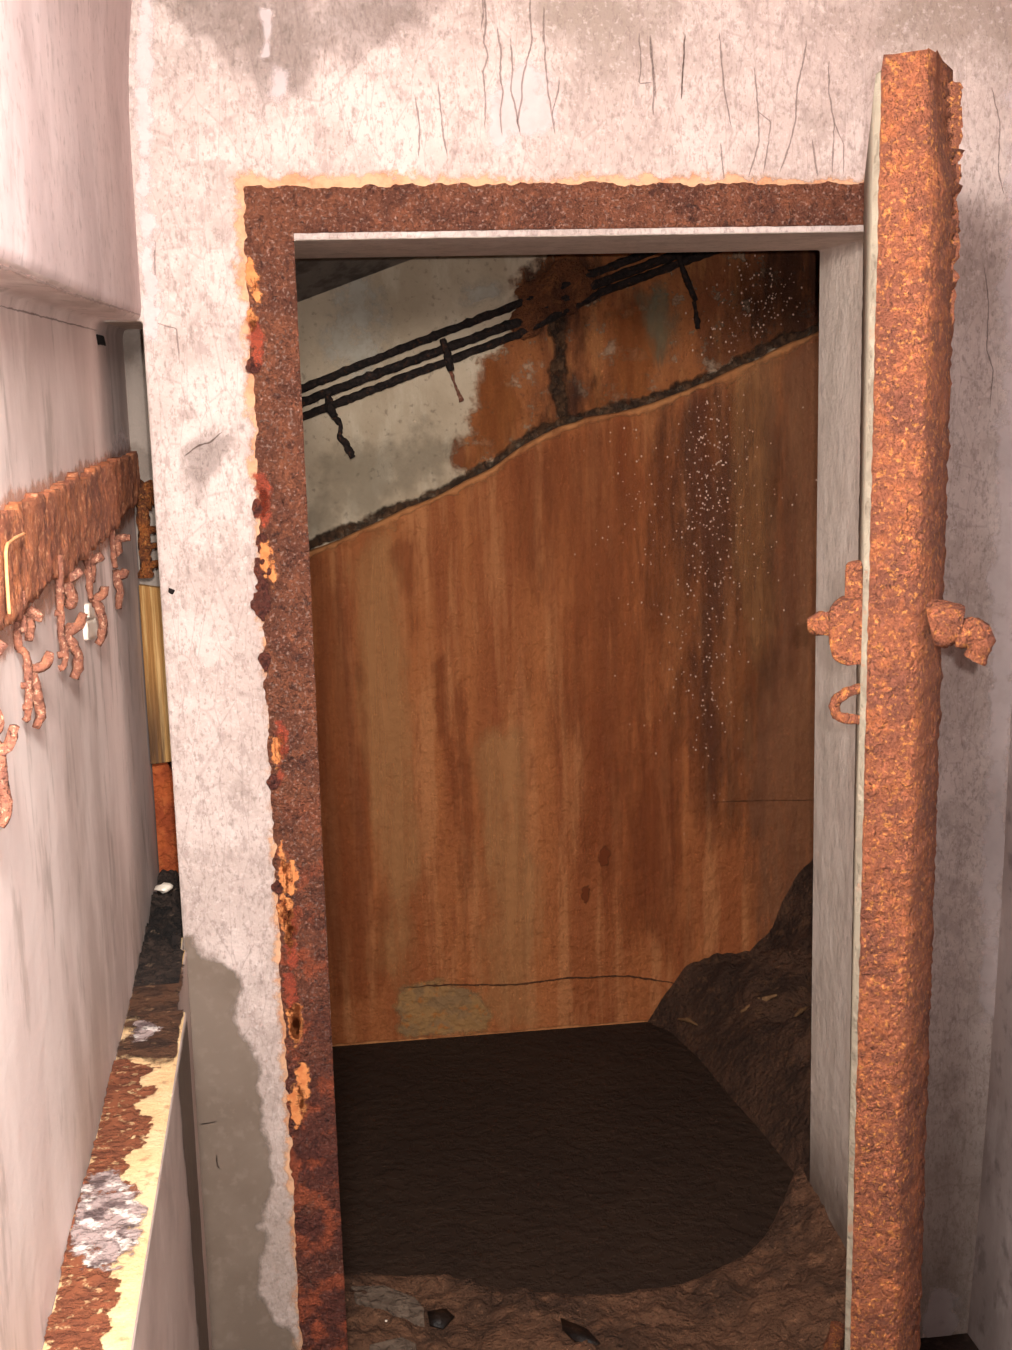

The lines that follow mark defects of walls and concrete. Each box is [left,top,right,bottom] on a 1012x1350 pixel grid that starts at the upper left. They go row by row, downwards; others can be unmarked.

crack [679,36,687,99]
corrosion [944,81,963,325]
corrosion [233,170,864,588]
corrosion [310,250,820,1045]
corrosion [268,721,289,786]
peeling [131,1020,162,1041]
corrosion [269,832,311,1349]
peeling [70,1170,148,1271]
corrosion [823,1321,845,1350]